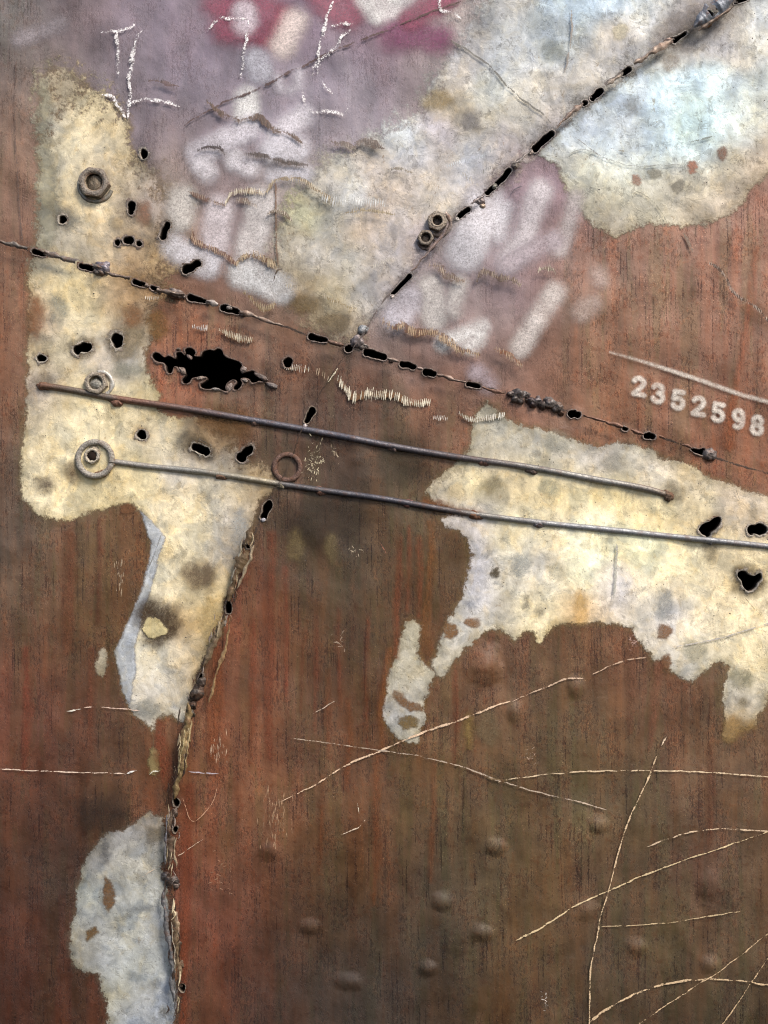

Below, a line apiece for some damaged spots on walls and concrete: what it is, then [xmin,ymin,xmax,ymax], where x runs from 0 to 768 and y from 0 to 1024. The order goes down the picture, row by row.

crack [451,40,551,123]
crack [564,10,573,73]
peeling [533,0,768,239]
crack [570,137,693,252]
peeling [19,55,279,732]
spalling [345,346,387,360]
peeling [382,400,768,745]
rust [443,618,480,639]
rust [657,624,672,639]
rust [661,654,672,671]
rust [393,690,423,729]
peeling [68,811,185,1024]